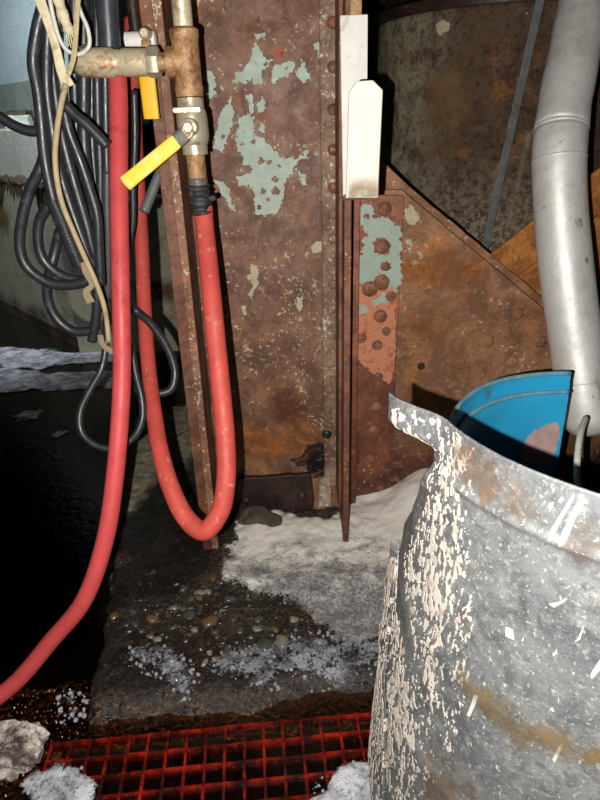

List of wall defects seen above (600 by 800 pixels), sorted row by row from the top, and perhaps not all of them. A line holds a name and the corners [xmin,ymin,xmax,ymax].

peeling [203,71,217,102]
peeling [212,33,311,217]
rust [349,184,377,197]
peeling [279,271,324,432]
peeling [358,204,424,384]
rust [455,449,499,500]